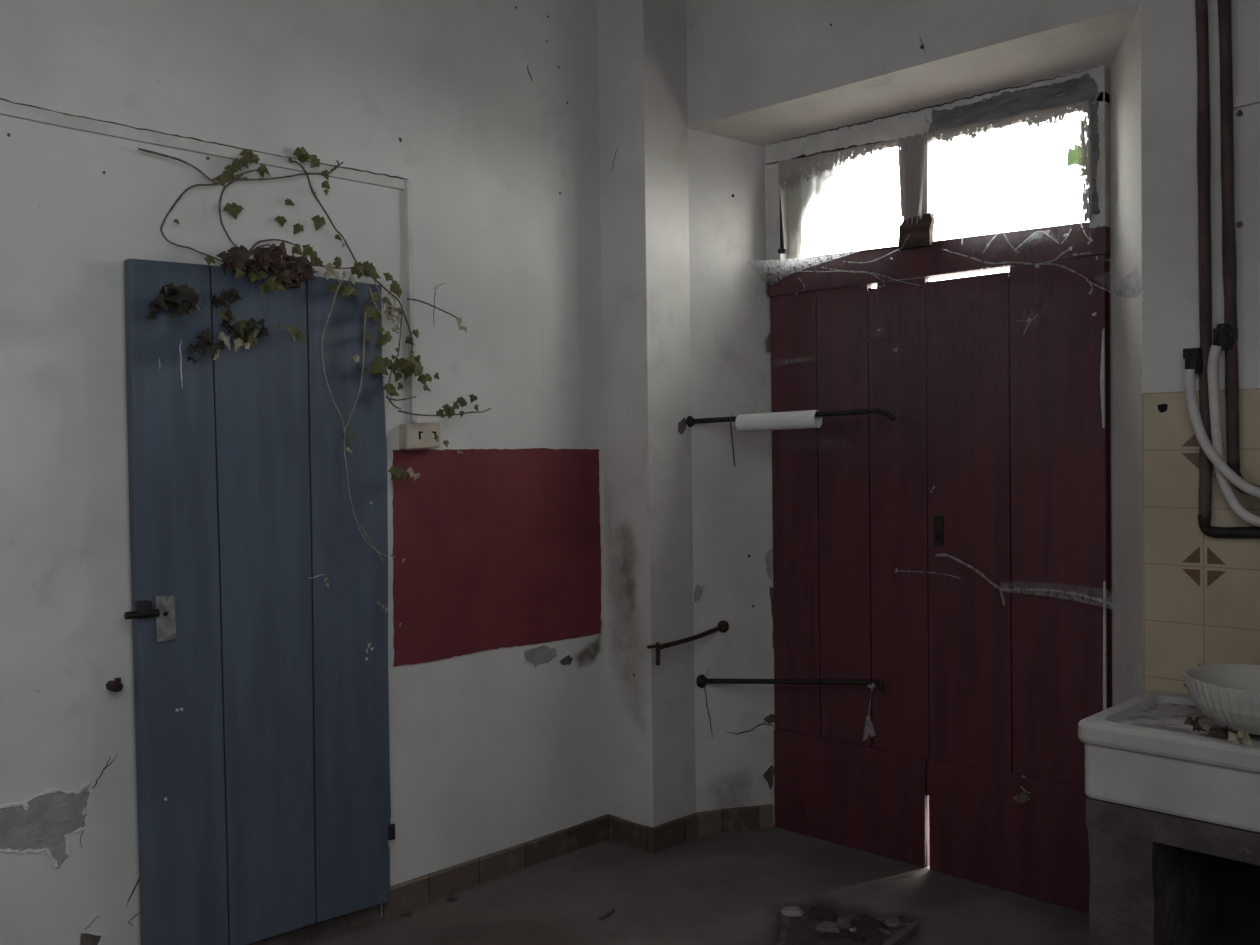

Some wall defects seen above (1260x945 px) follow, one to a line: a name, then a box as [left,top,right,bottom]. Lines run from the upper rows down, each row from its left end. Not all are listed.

spalling [0,781,94,872]